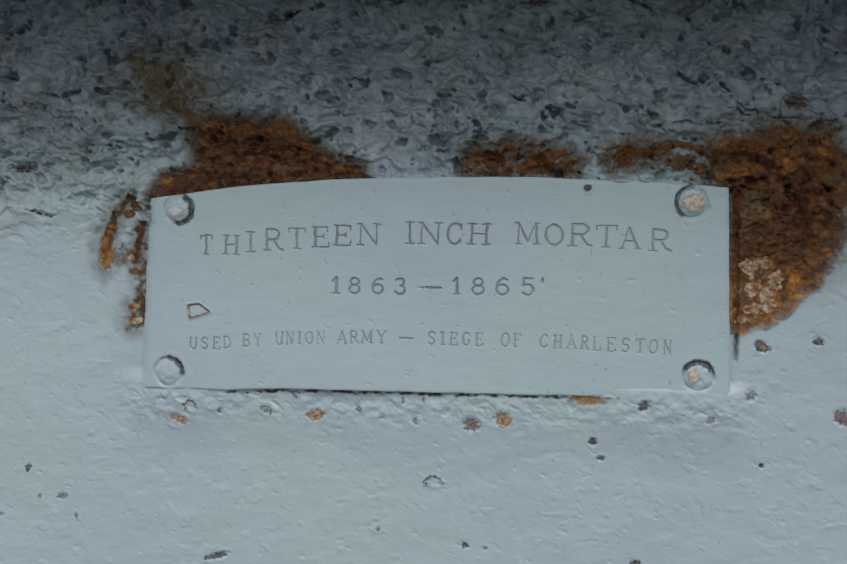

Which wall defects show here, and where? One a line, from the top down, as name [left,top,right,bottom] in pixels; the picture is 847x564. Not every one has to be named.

corrosion [128,56,366,201]
corrosion [460,137,585,179]
corrosion [600,123,847,336]
corrosion [99,193,148,327]
peeling [755,340,771,352]
corrosion [574,396,603,405]
peeling [834,408,847,425]